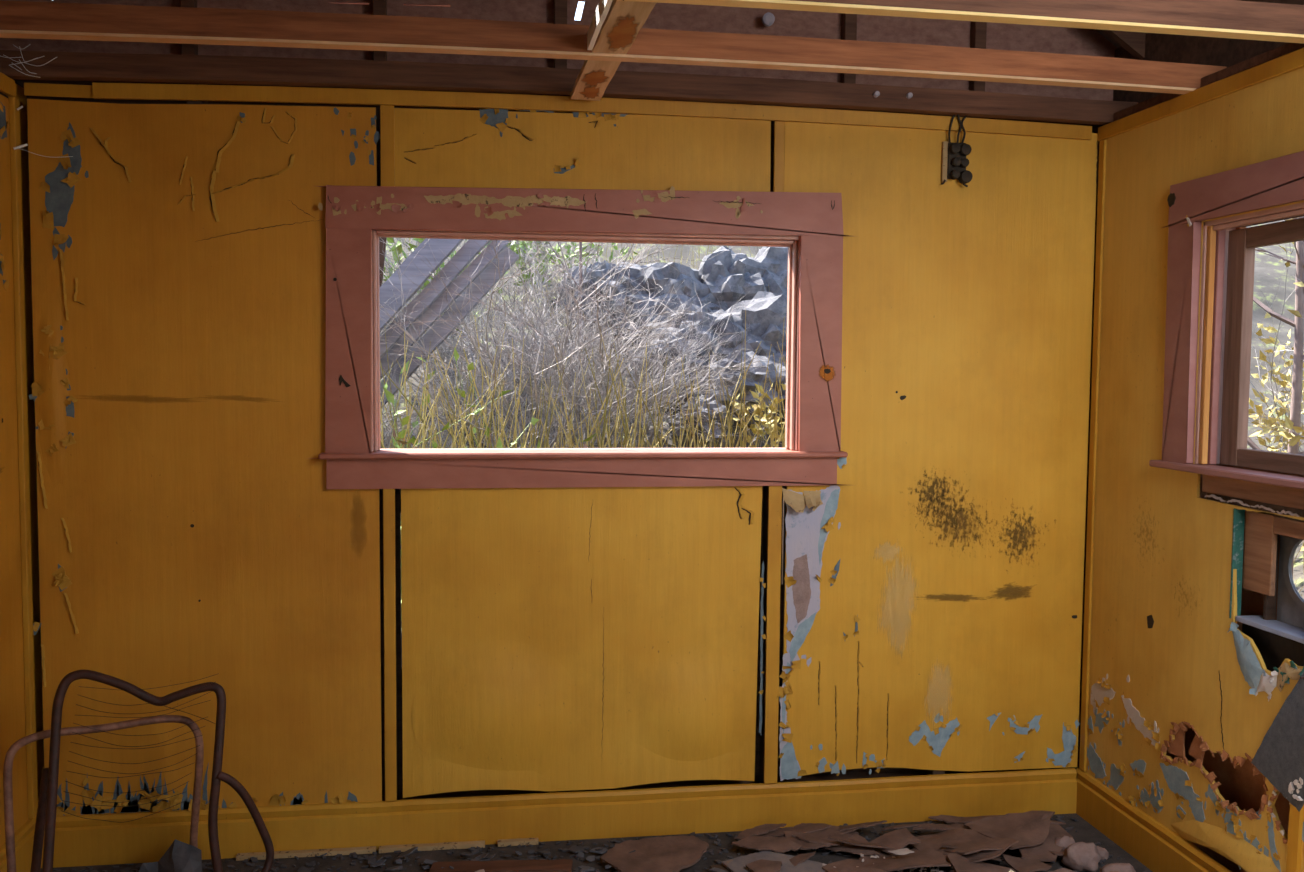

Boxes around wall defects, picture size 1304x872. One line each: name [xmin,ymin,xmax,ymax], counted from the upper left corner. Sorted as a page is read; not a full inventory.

peeling [39,122,89,260]
damp [911,475,1046,562]
peeling [758,485,846,781]
damp [998,585,1029,599]
peeling [862,752,886,774]
peeling [909,713,962,757]
peeling [987,713,1043,735]
spalling [1046,674,1304,872]